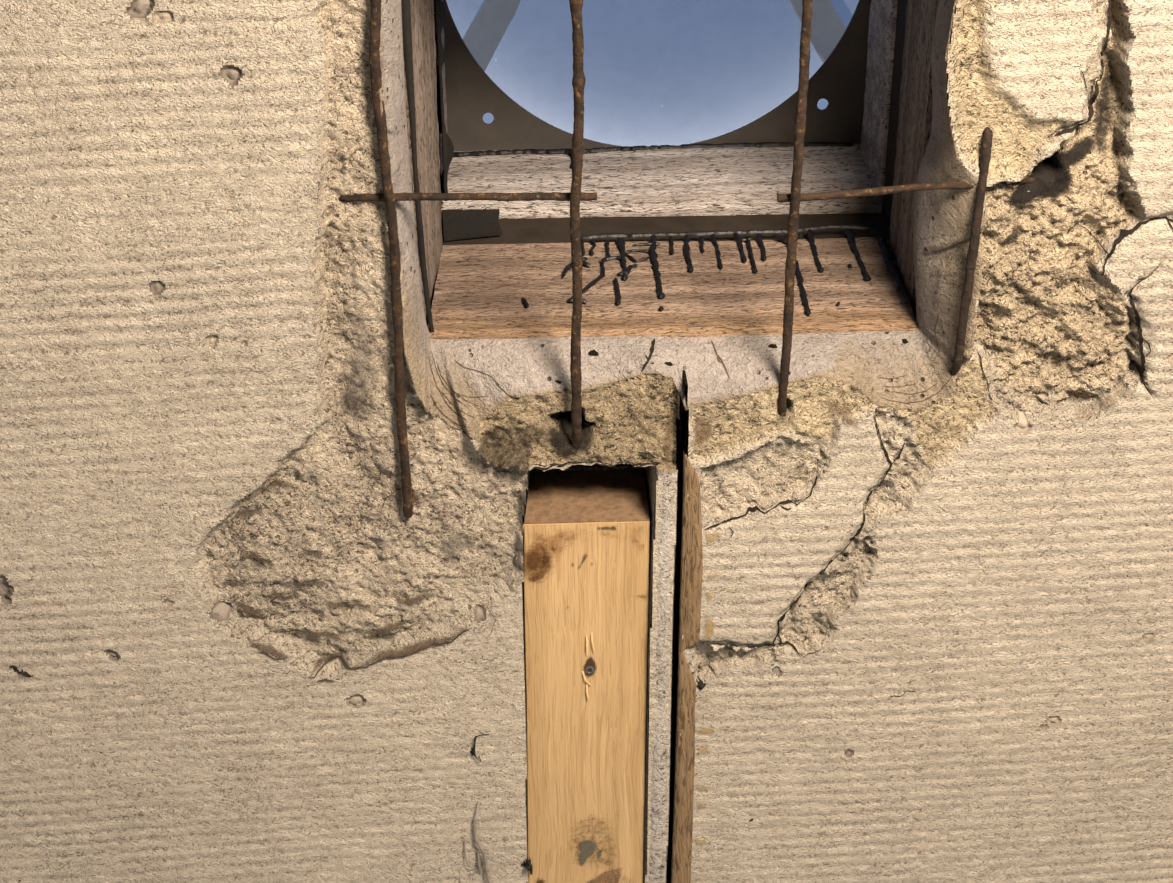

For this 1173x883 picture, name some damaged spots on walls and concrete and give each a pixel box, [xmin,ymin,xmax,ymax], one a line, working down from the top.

spalling [187,0,1150,690]
crack [1077,216,1173,276]
crack [1128,274,1155,399]
crack [690,415,905,657]